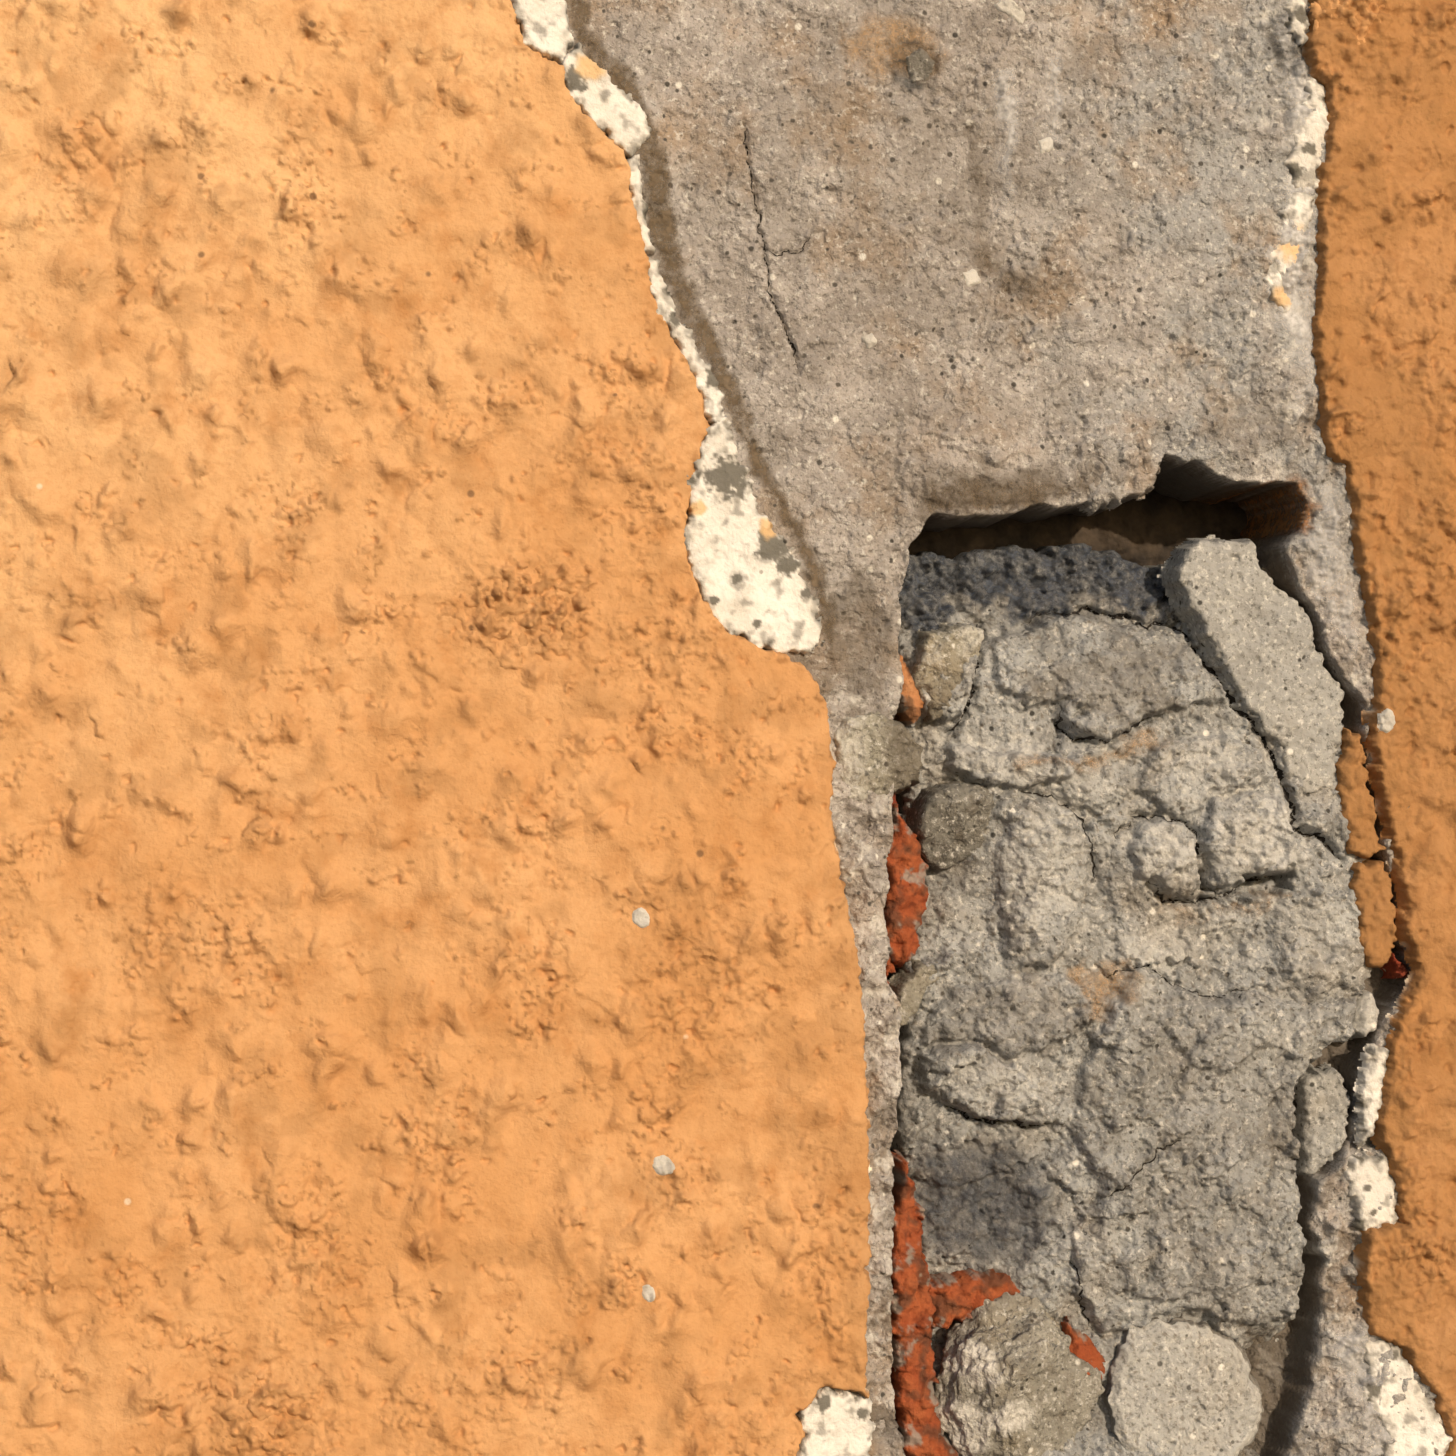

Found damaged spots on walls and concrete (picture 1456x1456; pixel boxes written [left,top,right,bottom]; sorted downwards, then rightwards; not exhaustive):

crack [743,124,811,369]
spalling [510,0,1453,1456]